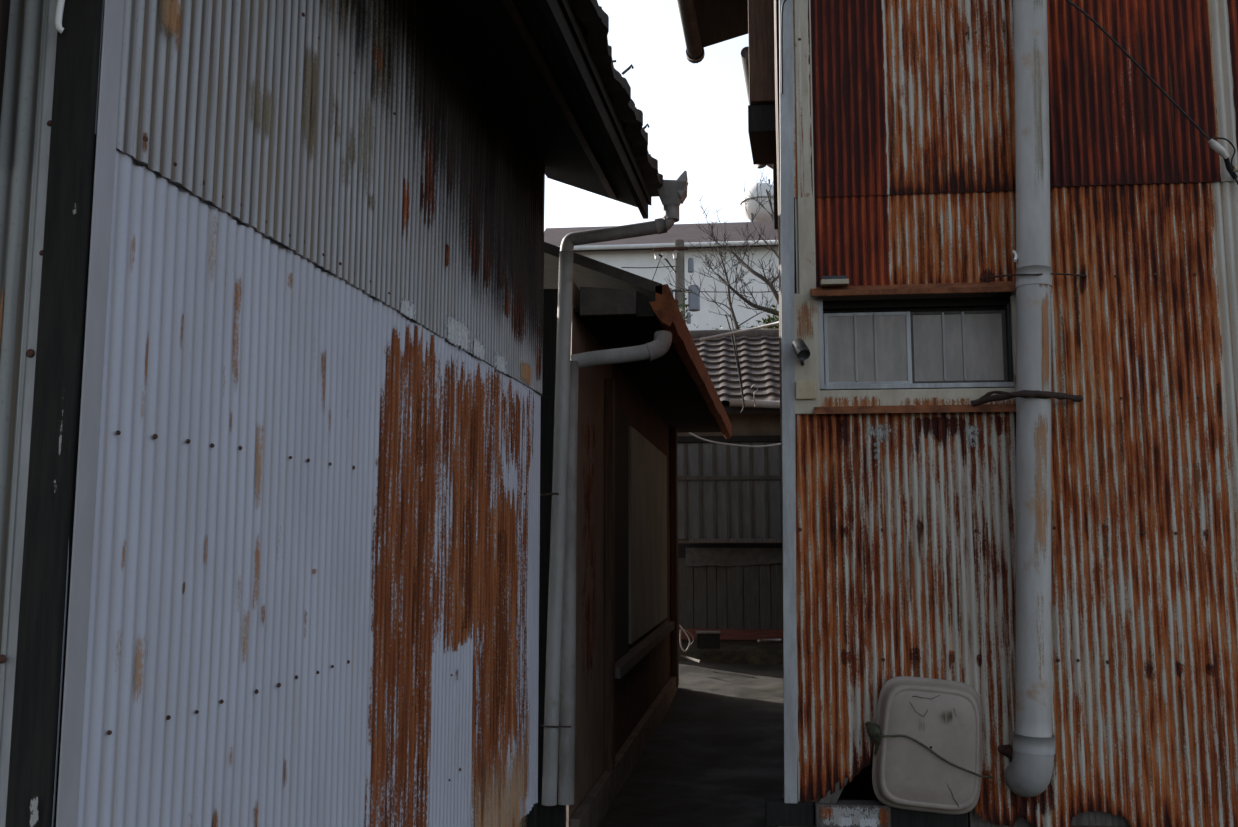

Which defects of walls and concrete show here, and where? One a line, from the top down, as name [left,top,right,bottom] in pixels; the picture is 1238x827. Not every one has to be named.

rust [402,110,451,241]
rust [365,200,541,827]
rust [793,0,1238,827]